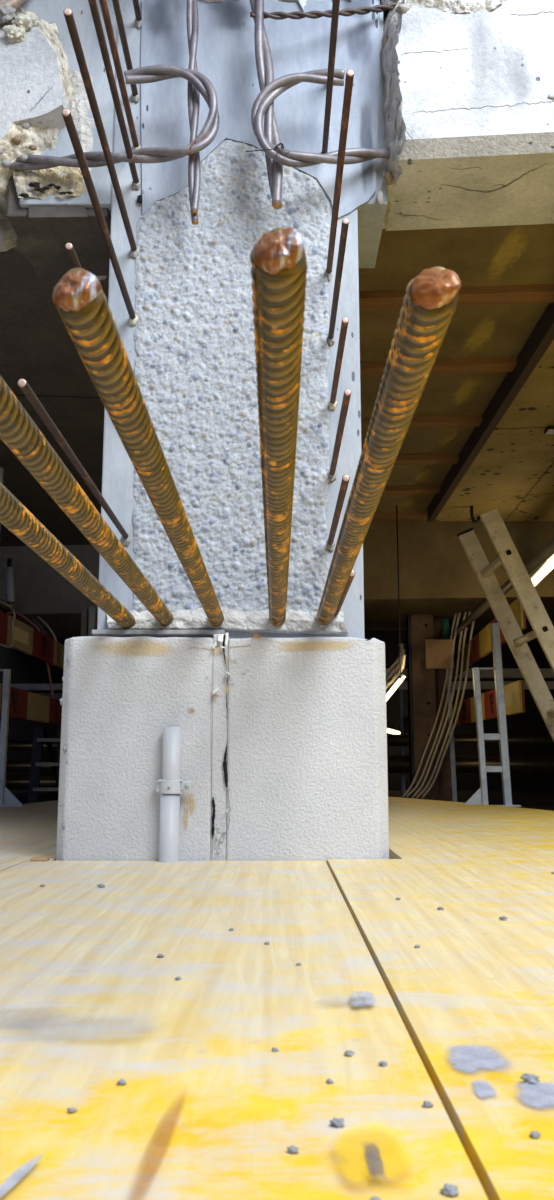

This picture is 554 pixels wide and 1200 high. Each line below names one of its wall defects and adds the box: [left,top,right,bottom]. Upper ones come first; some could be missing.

crack [443,163,548,193]
spalling [0,0,506,649]
crack [188,632,271,851]